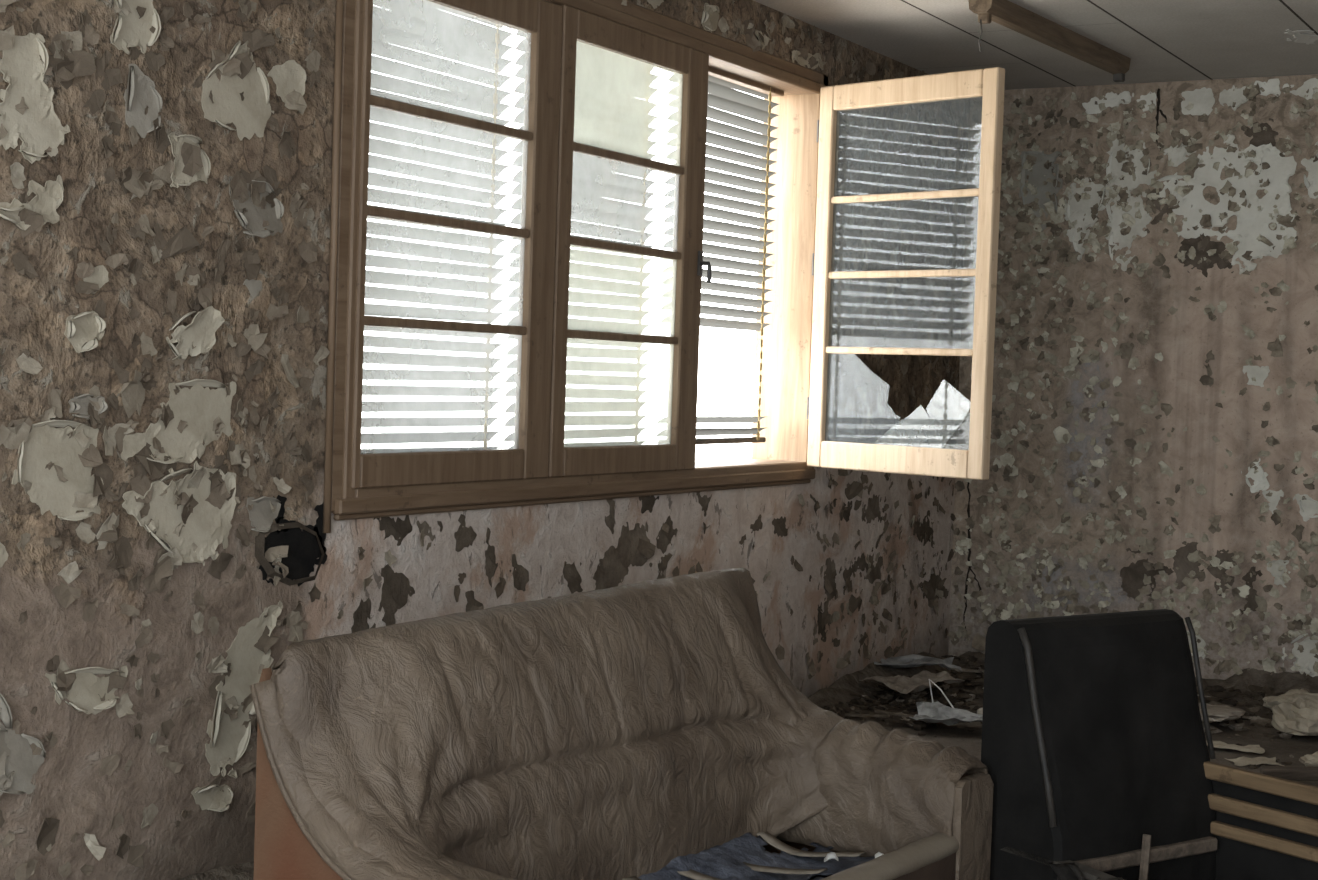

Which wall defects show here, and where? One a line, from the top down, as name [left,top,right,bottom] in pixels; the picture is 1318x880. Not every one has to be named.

peeling [694,0,925,86]
peeling [0,0,330,848]
peeling [790,78,1318,679]
spalling [337,514,529,633]
spalling [563,496,703,594]
spalling [696,492,712,534]
spalling [739,514,788,550]
peeling [14,803,158,880]